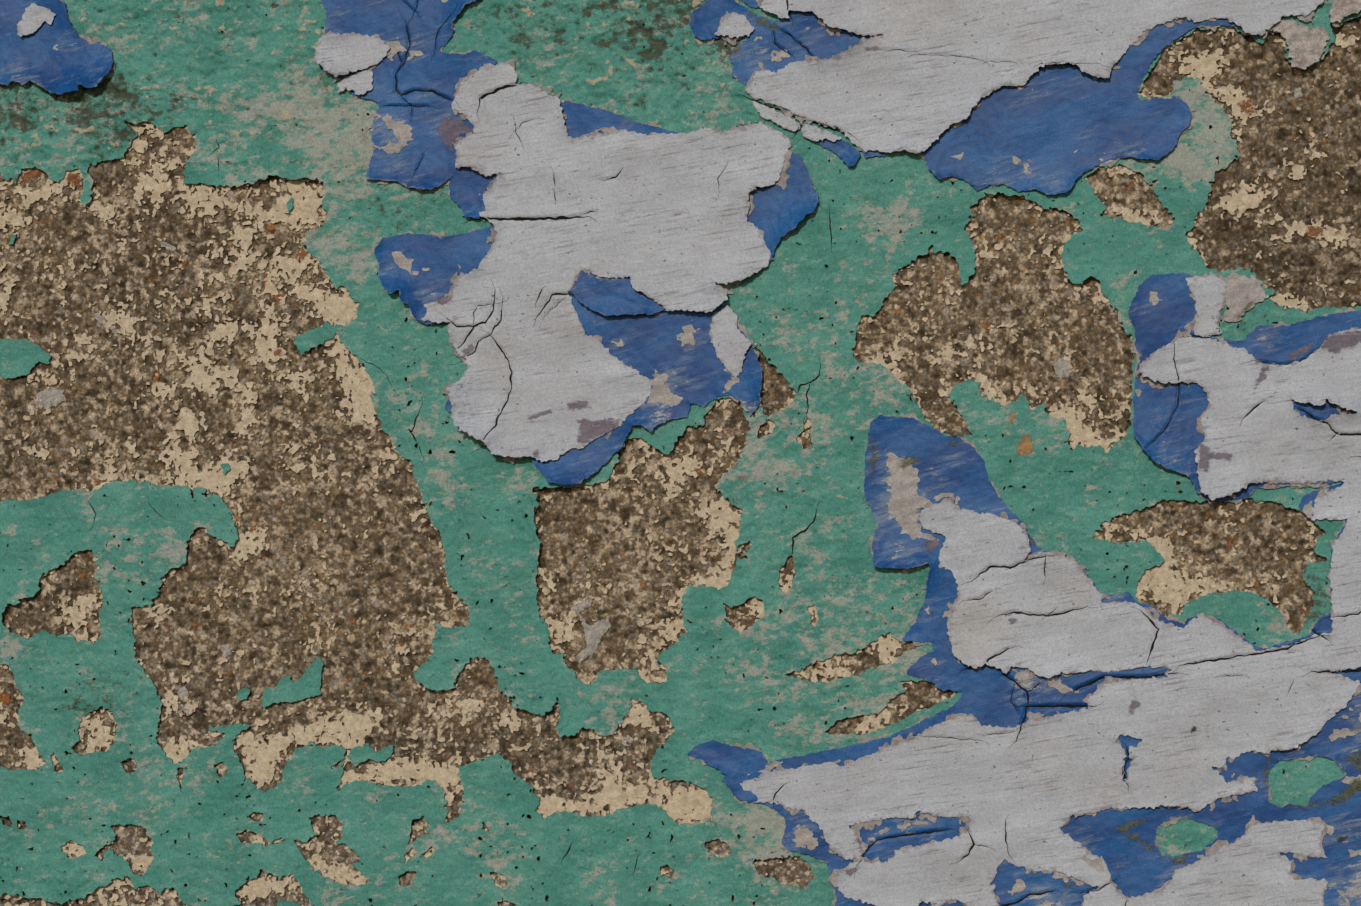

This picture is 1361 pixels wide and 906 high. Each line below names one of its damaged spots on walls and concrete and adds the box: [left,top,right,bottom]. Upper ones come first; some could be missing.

peeling [0,0,116,98]
crack [740,94,857,139]
crack [461,168,623,224]
crack [440,280,582,453]
crack [1240,345,1361,458]
spalling [0,121,715,825]
peeling [313,0,1361,906]
spalling [0,816,191,906]
spalling [234,869,315,906]
spalling [236,804,370,886]
crack [854,818,1015,879]
crack [995,876,1129,906]